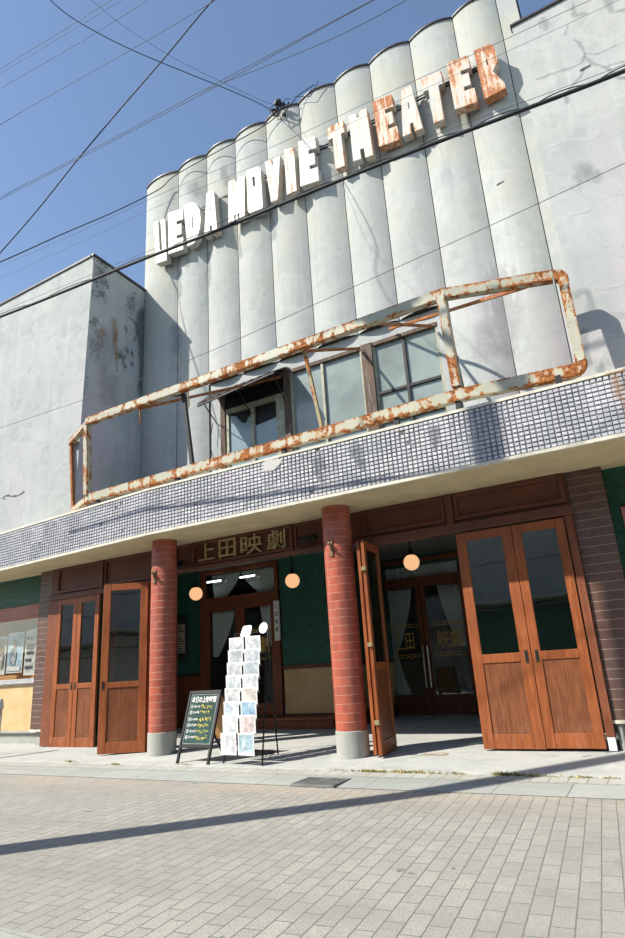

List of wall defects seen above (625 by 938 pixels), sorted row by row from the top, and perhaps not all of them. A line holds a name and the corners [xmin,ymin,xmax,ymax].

leakage [130,305,145,395]